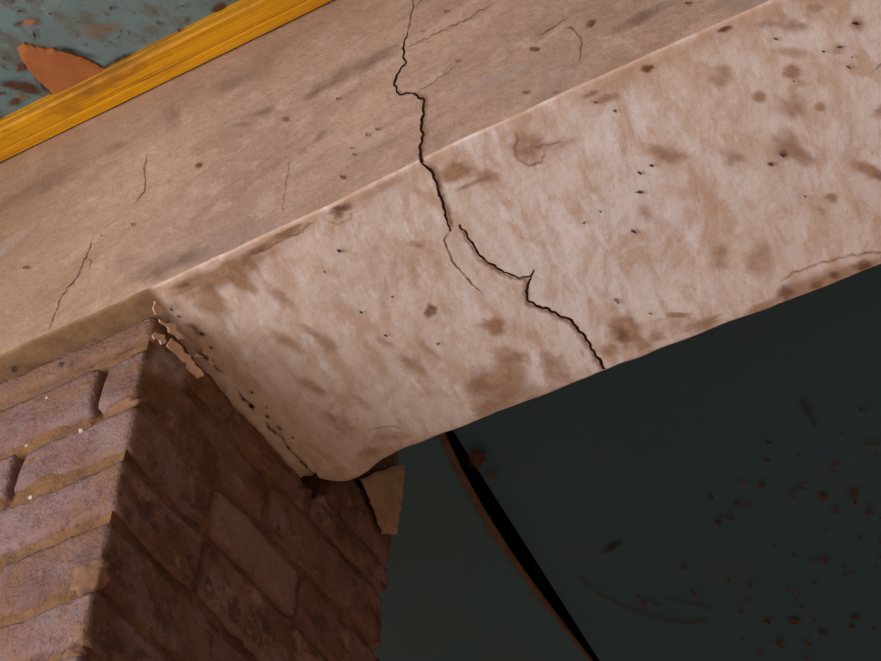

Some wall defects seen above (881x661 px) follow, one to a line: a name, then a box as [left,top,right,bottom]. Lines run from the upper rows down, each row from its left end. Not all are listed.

crack [393,0,605,370]
peeling [152,301,220,379]
peeling [266,415,319,499]